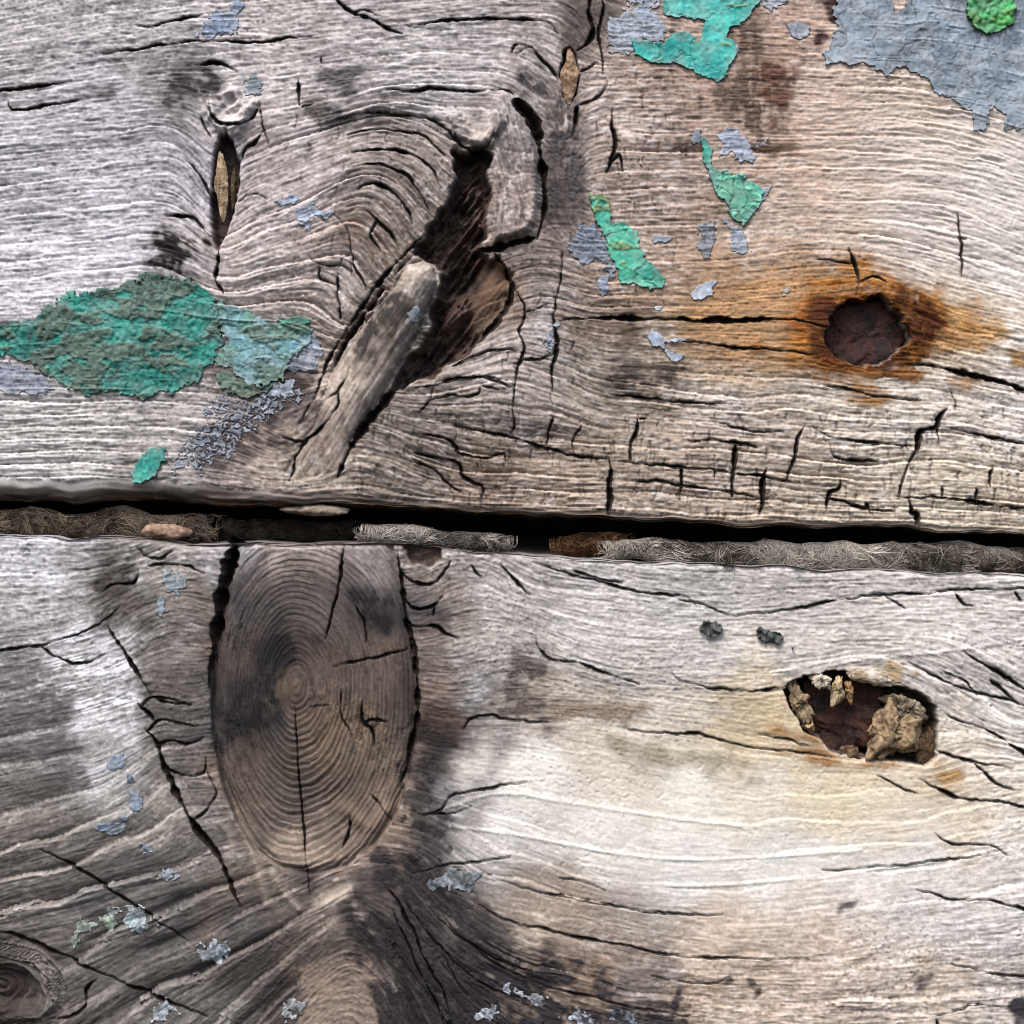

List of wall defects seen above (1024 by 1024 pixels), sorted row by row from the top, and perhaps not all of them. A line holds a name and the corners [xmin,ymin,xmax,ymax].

peeling [607,0,789,83]
peeling [822,0,1024,132]
peeling [0,272,324,484]
peeling [568,193,673,296]
crack [283,85,1024,527]
peeling [689,127,772,259]
rust [685,257,1024,406]
peeling [95,752,143,835]
crack [0,537,246,908]
crack [295,693,388,893]
crack [325,548,1024,785]
crack [42,850,189,941]